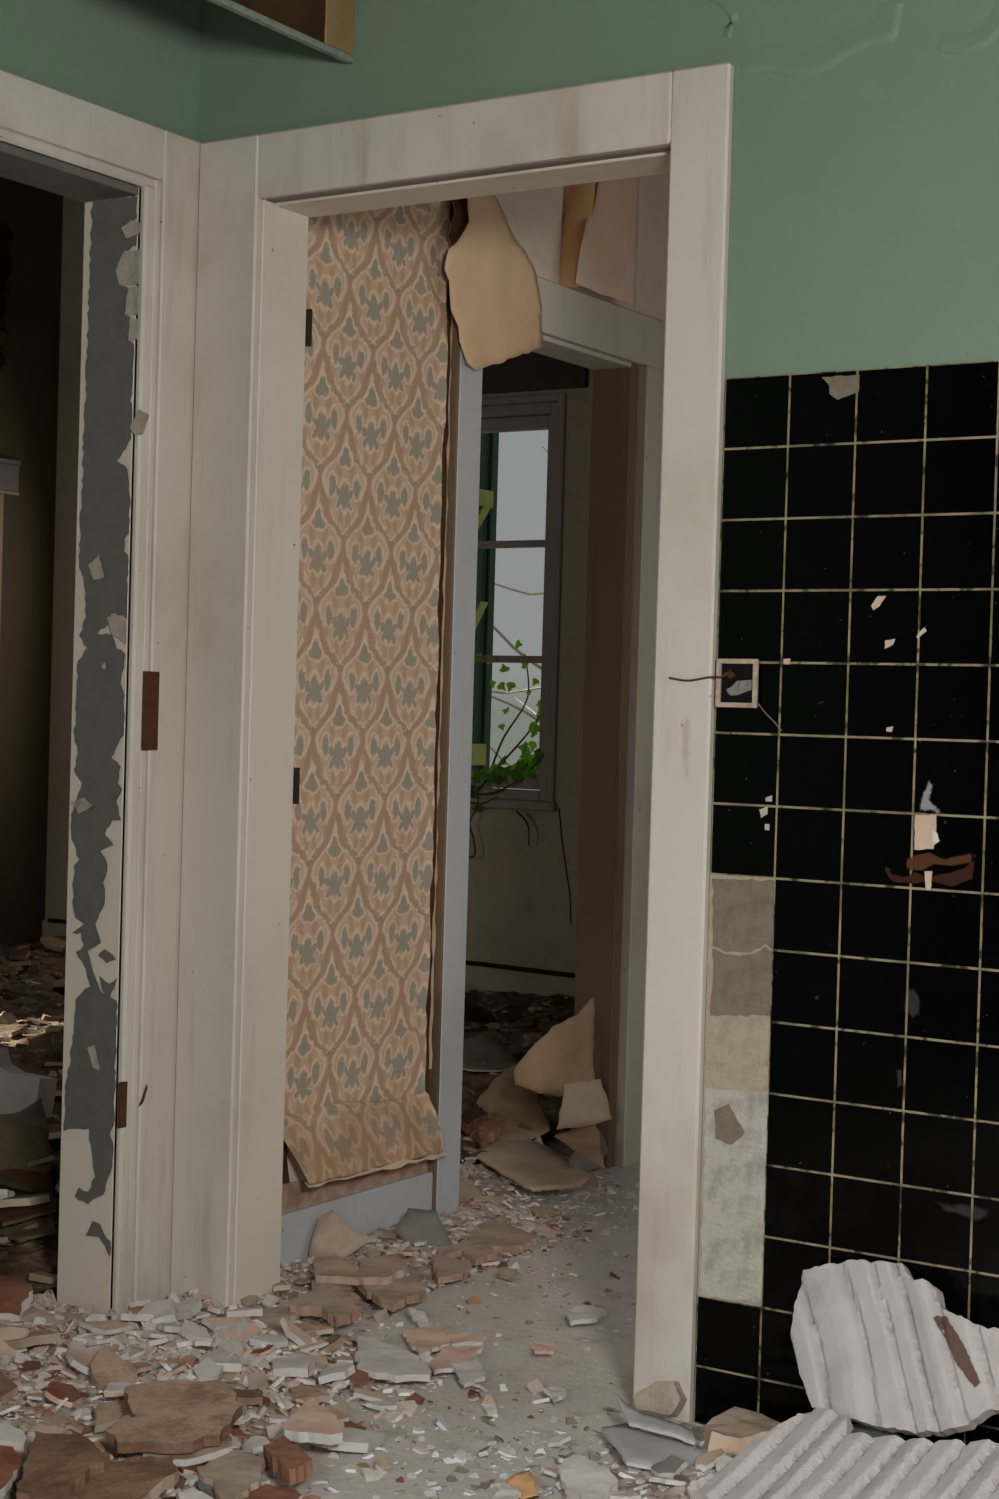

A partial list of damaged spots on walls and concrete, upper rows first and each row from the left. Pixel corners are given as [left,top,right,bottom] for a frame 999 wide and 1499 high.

peeling [63,196,150,1256]